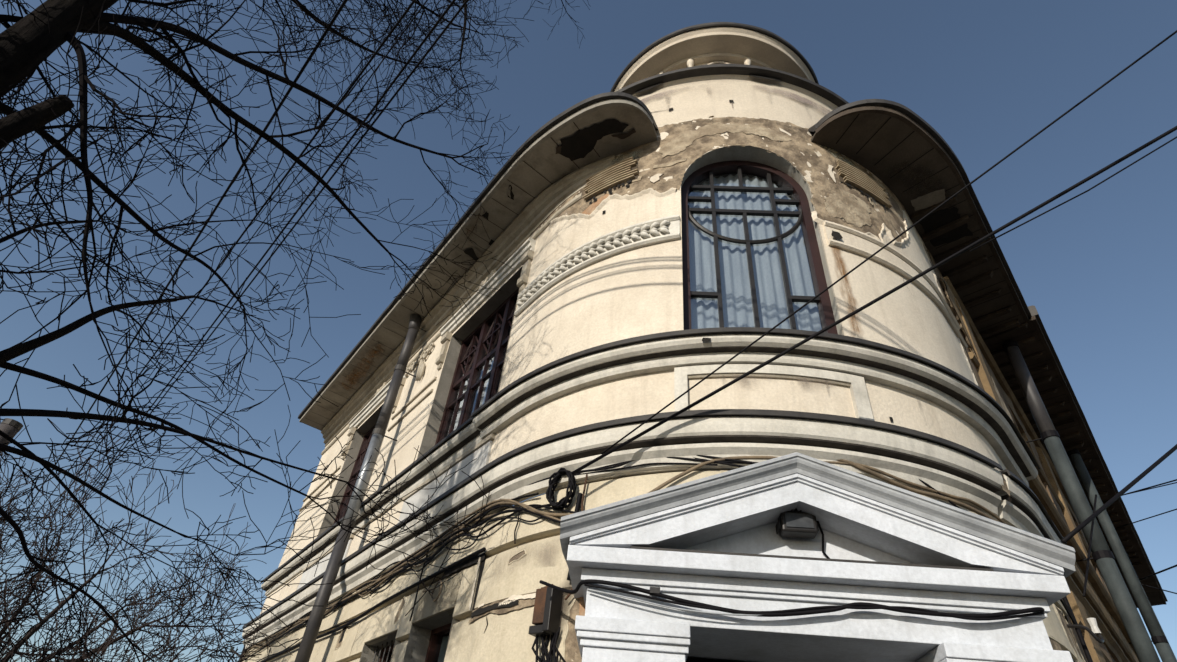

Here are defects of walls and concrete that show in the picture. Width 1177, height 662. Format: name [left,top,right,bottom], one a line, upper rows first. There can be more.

flaking render [533,100,1014,423]